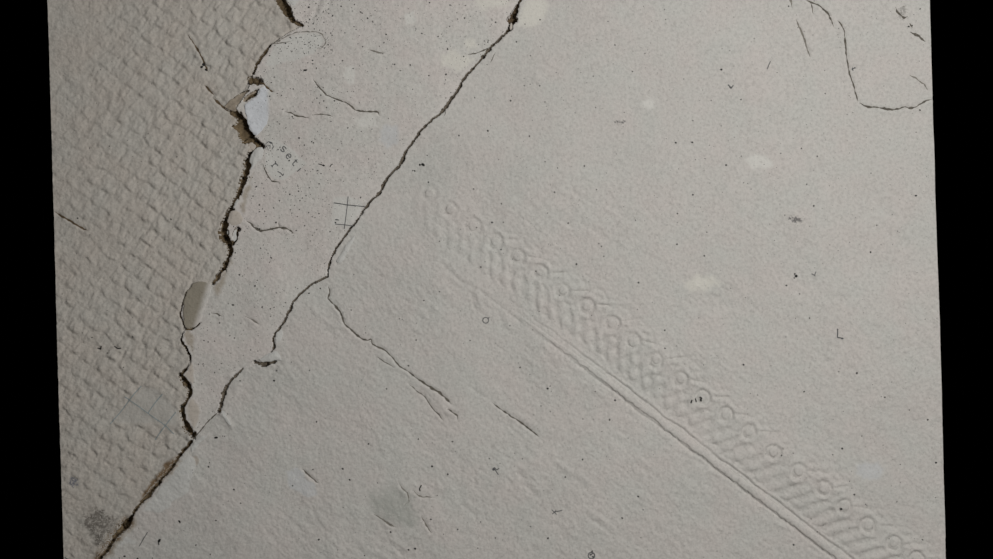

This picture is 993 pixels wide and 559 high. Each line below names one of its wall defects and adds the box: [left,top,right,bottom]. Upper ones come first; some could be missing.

crack [789,0,931,111]
peeling [245,86,273,135]
peeling [249,147,264,170]
crack [54,211,86,230]
crack [99,0,522,559]
peeling [183,281,211,328]
crack [493,403,538,436]